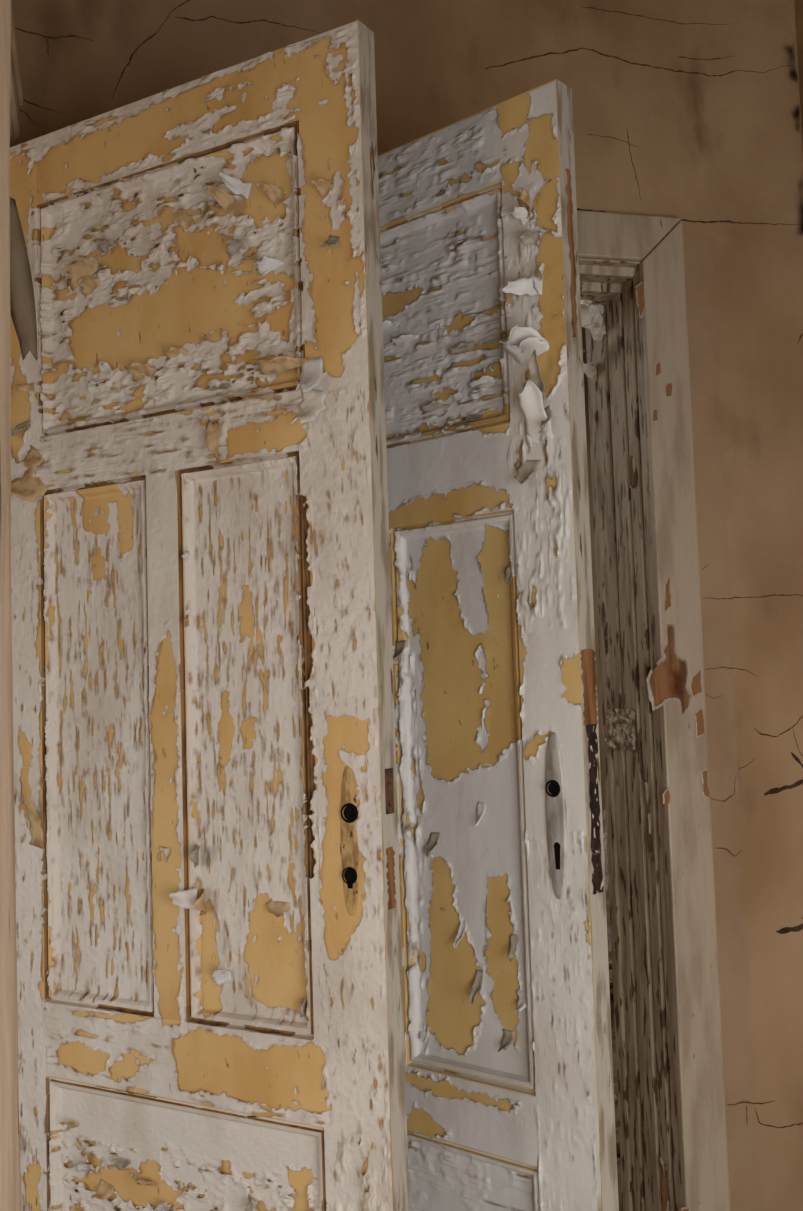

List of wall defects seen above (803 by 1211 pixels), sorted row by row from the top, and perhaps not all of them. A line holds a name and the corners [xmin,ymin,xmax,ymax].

crack [15,28,93,56]
crack [114,0,318,93]
crack [486,48,790,76]
peeling [502,263,544,296]
peeling [498,325,554,444]
peeling [11,445,48,501]
crack [701,565,803,599]
peeling [646,576,706,738]
crack [711,716,803,802]
peeling [169,888,206,915]
peeling [386,844,401,910]
crack [728,1101,803,1128]